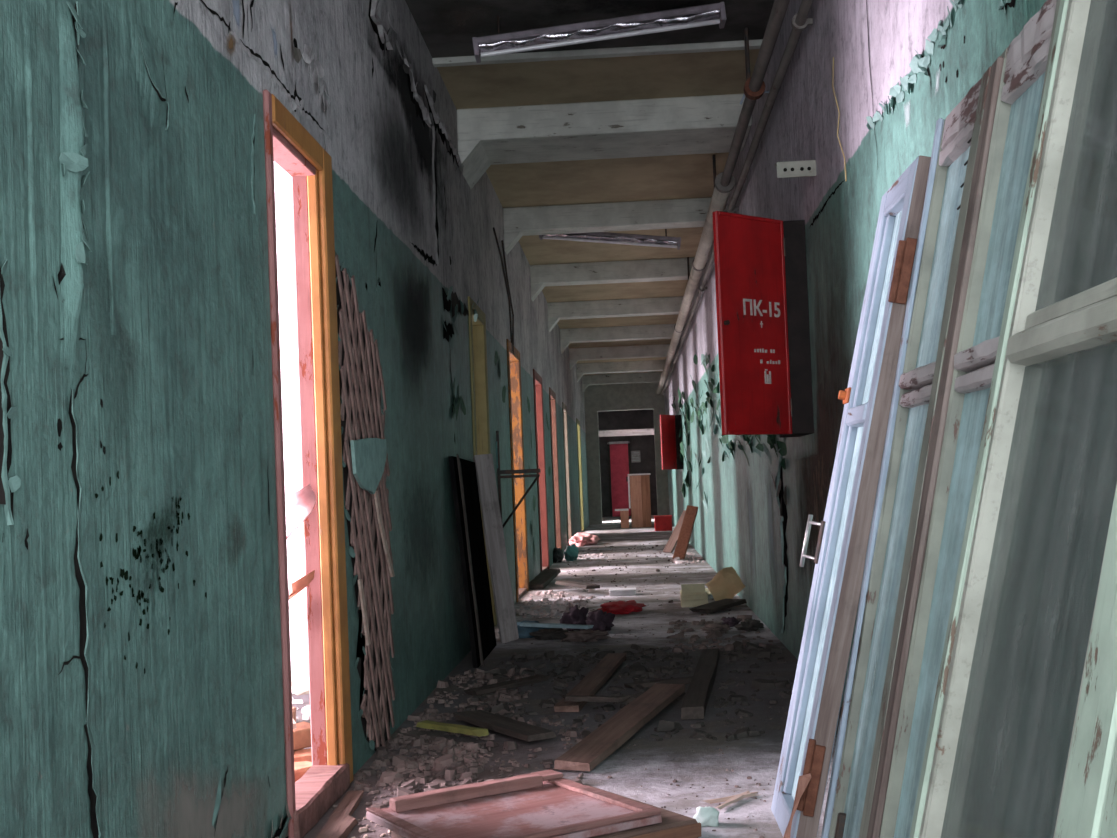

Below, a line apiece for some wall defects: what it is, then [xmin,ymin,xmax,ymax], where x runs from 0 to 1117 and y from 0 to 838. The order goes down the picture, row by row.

crack [173,0,330,142]
crack [249,114,257,214]
water stain [369,39,444,212]
crack [412,126,451,266]
crack [809,181,844,228]
peeling [866,0,962,130]
peeling [998,0,1015,14]
crack [58,338,101,838]
water stain [100,496,190,641]
flaking render [335,251,395,751]
crack [770,454,789,633]
flaking render [271,803,292,838]